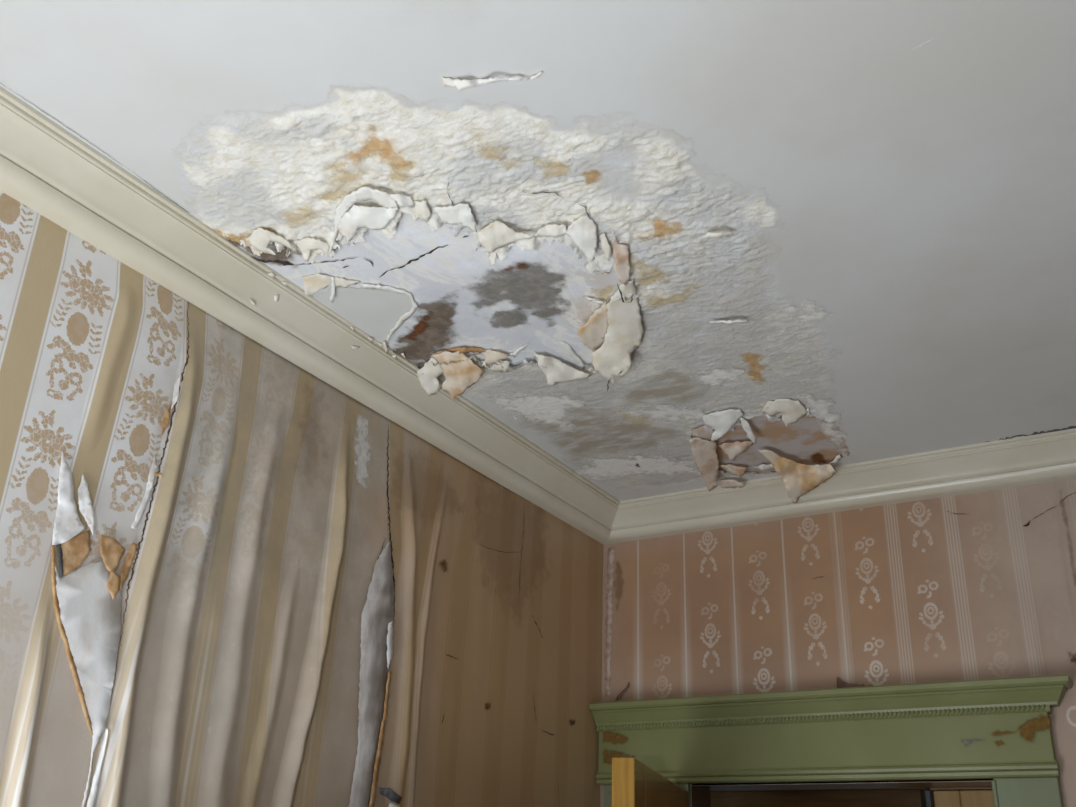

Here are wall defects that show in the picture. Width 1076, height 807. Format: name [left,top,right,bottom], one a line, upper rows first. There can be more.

peeling [227,182,644,406]
leakage [470,263,566,328]
leakage [390,302,456,369]
leakage [696,369,744,386]
leakage [488,393,584,430]
leakage [799,395,846,452]
leakage [574,455,701,480]
peeling [689,398,850,504]
crack [1024,492,1076,527]
flaking render [56,530,125,578]
peeling [603,732,634,764]
peeling [992,715,1051,746]